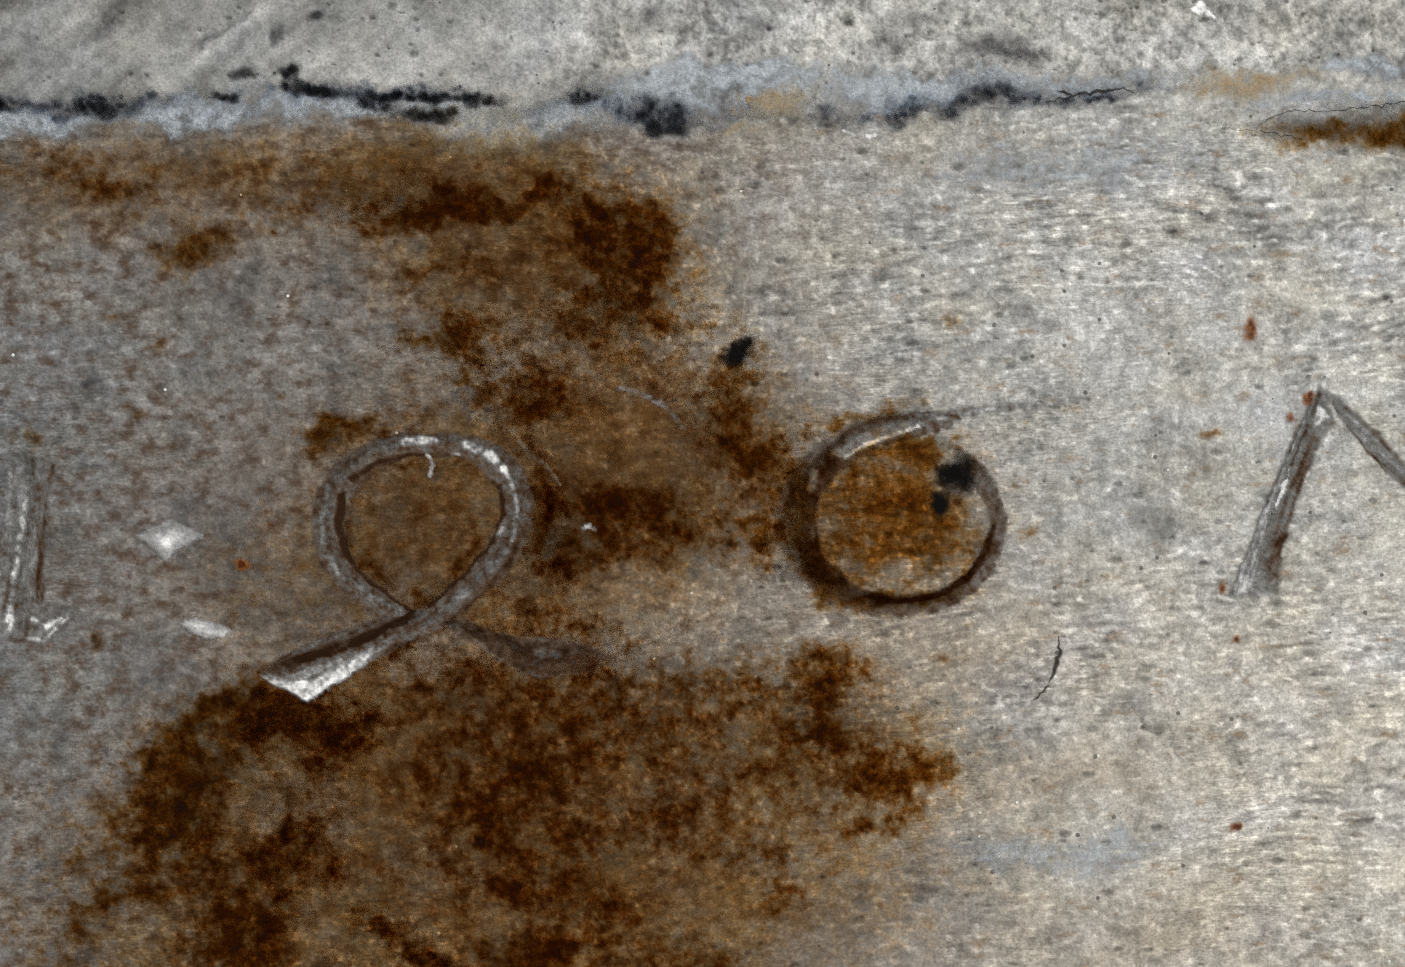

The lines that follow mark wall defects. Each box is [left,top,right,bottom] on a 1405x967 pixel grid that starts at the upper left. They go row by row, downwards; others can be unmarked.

rust [1287,114,1405,147]
rust [81,180,133,198]
rust [159,229,230,269]
rust [362,171,679,348]
rust [405,311,573,424]
rust [306,412,387,456]
rust [530,365,989,611]
rust [519,599,594,634]
rust [70,645,954,967]